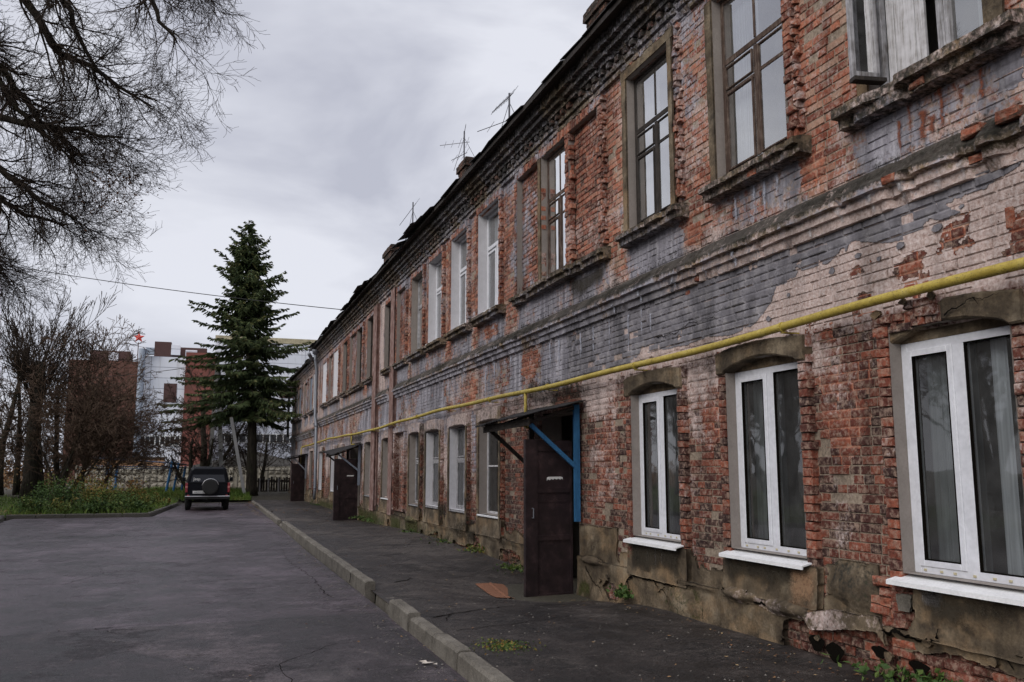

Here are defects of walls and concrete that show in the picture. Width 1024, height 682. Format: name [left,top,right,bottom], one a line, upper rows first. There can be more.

spalling [909,75,925,91]
peeling [990,48,1024,95]
spalling [960,104,1024,141]
peeling [566,146,1024,378]
crack [585,566,696,602]
spalling [777,575,1024,682]
crack [879,628,955,648]